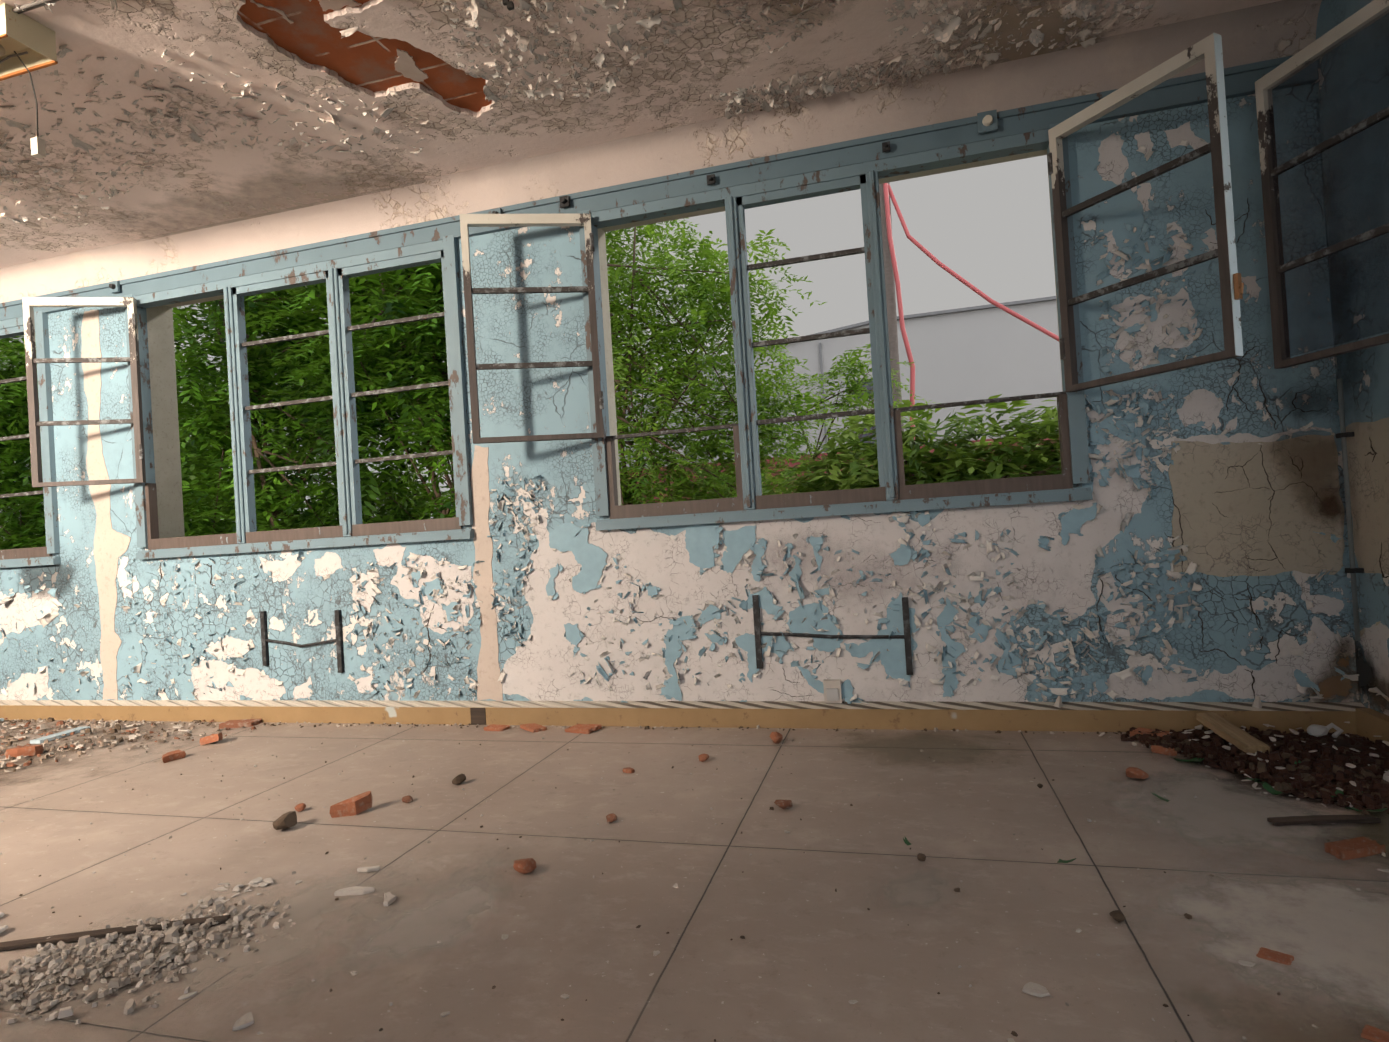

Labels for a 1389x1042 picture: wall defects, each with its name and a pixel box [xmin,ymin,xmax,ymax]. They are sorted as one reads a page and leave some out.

spalling [0,0,847,225]
peeling [710,0,1154,119]
peeling [0,574,90,700]
peeling [121,115,1389,708]
crack [1096,571,1157,649]
crack [1154,346,1327,698]